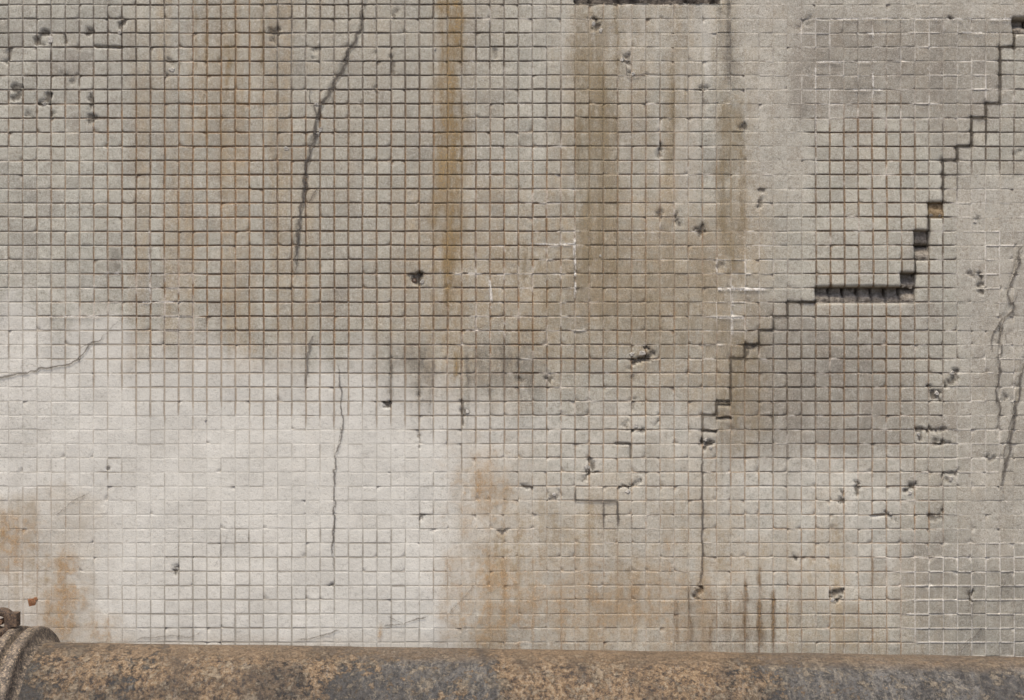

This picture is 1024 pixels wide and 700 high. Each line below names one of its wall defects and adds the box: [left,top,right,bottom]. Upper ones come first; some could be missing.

crack [284,8,365,268]
rust [433,0,464,292]
crack [942,34,1016,191]
peeling [814,202,944,303]
crack [0,328,111,378]
spalling [629,346,656,365]
crack [702,301,815,431]
crack [991,246,1024,482]
crack [331,370,344,550]
crack [688,459,704,609]